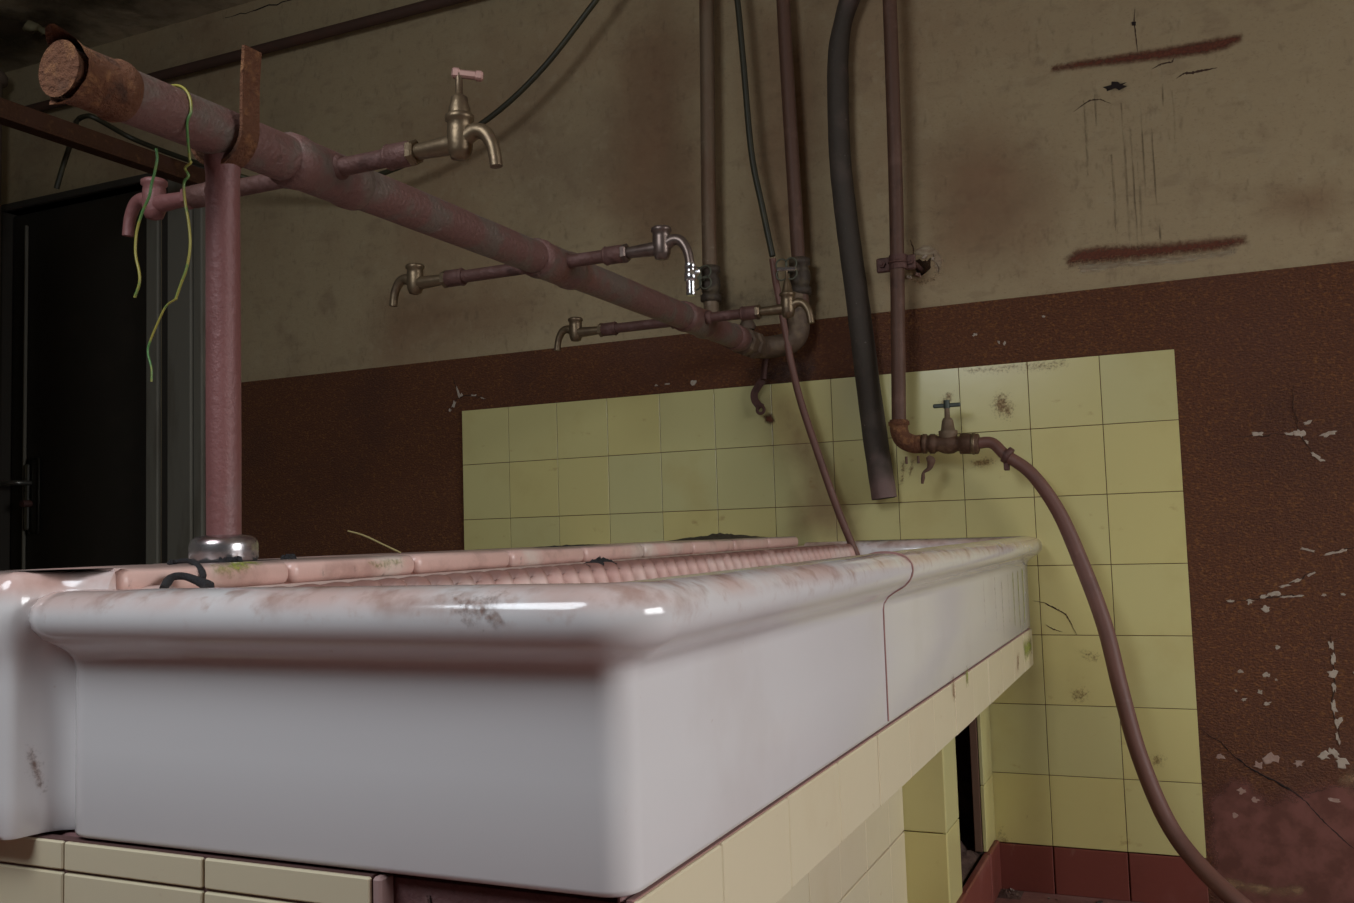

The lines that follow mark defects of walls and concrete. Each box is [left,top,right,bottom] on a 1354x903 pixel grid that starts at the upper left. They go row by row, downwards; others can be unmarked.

damp [0,0,132,58]
peeling [1237,412,1337,462]
peeling [1223,572,1315,613]
crack [1206,733,1353,848]
flaking render [1208,635,1354,903]